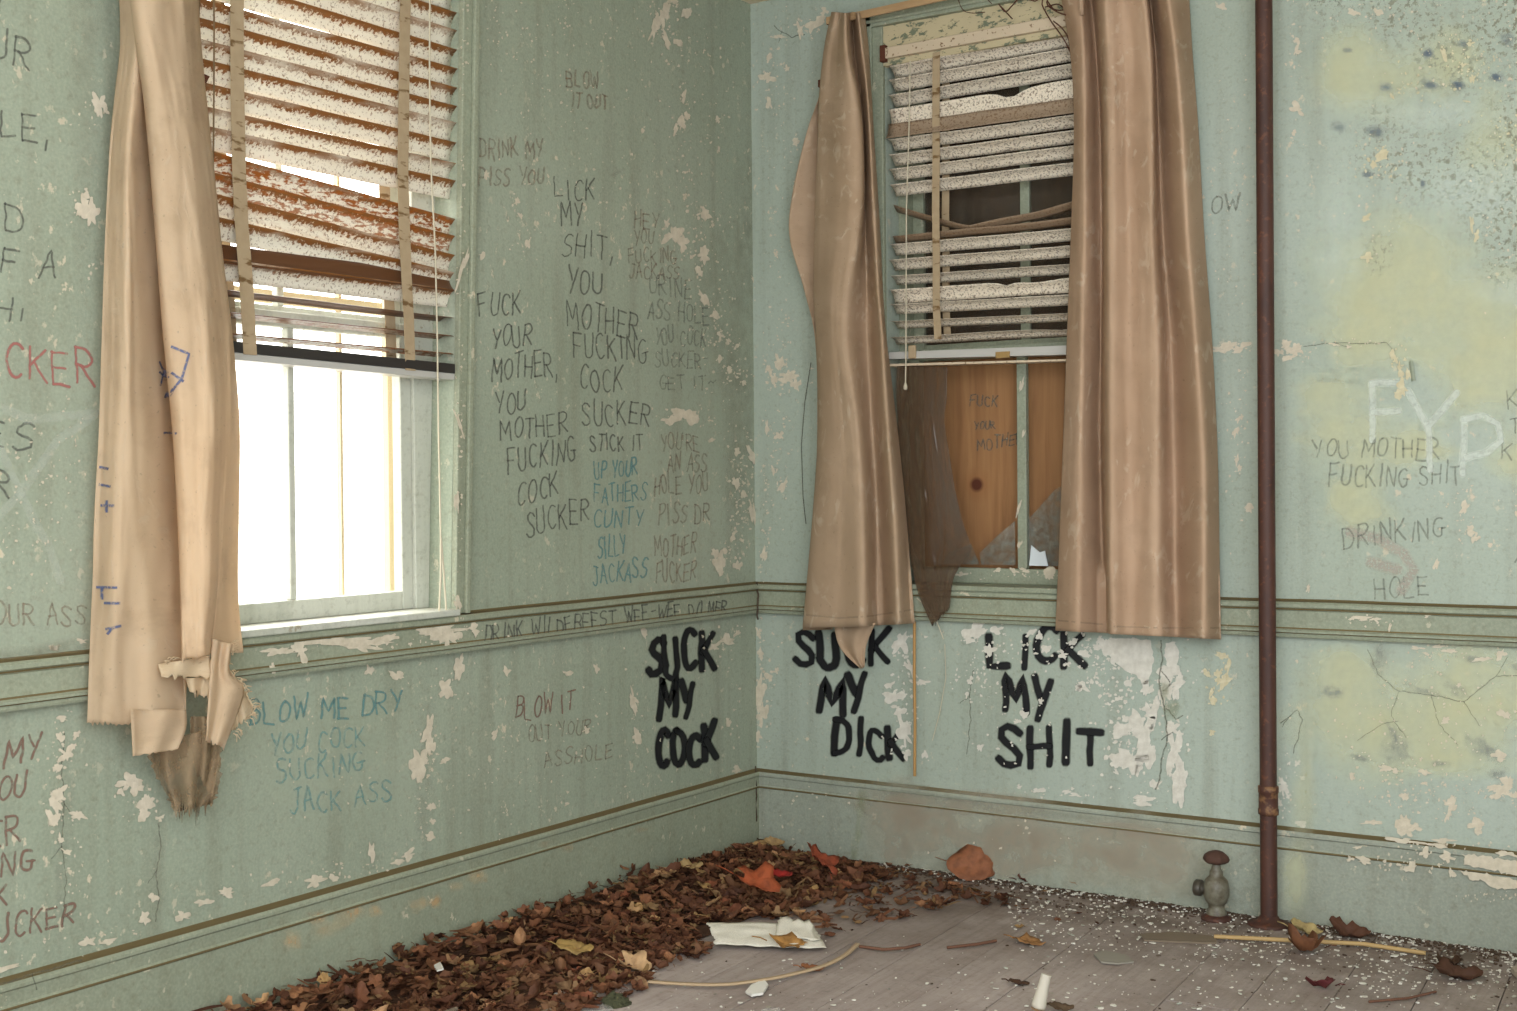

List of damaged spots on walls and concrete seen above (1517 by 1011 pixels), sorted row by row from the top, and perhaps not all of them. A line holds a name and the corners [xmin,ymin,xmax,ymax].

water stain [1372,0,1517,90]
water stain [1364,144,1462,188]
water stain [1472,96,1517,267]
peeling [460,0,815,582]
peeling [36,710,88,916]
peeling [250,594,510,889]
peeling [453,664,673,809]
peeling [881,623,1233,809]
peeling [1327,644,1517,902]
crack [1357,649,1517,744]
peeling [43,893,160,956]
peeling [175,887,233,922]